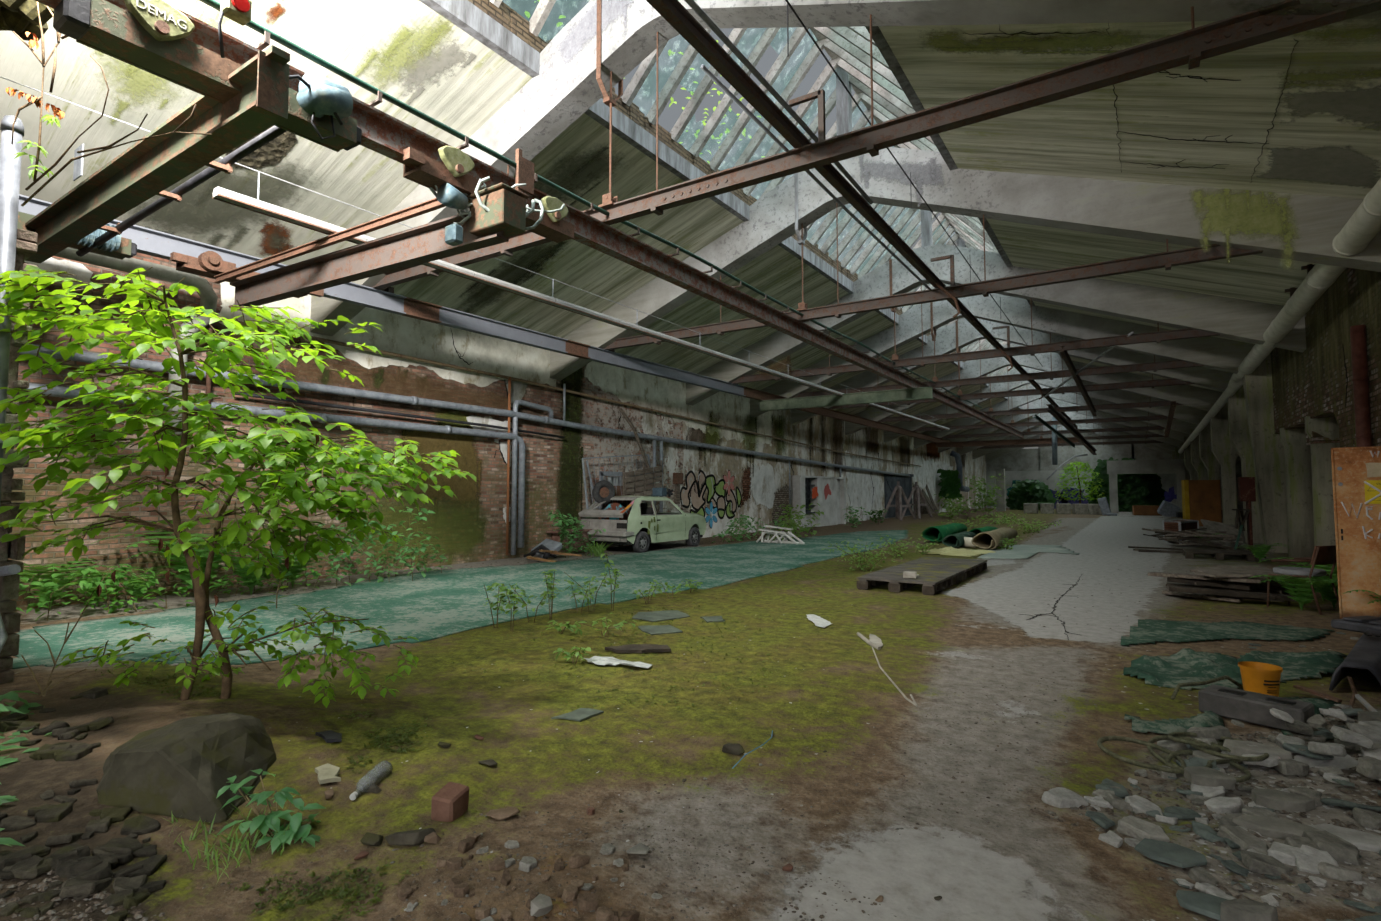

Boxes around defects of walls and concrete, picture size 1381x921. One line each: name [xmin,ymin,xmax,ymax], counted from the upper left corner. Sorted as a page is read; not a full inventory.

rust [265,3,284,23]
crack [963,23,1113,50]
damp [399,39,476,105]
crack [1113,39,1299,180]
rust [212,194,367,255]
rust [421,262,843,396]
peeling [584,361,773,446]
peeling [739,461,792,529]
crack [1019,576,1081,640]